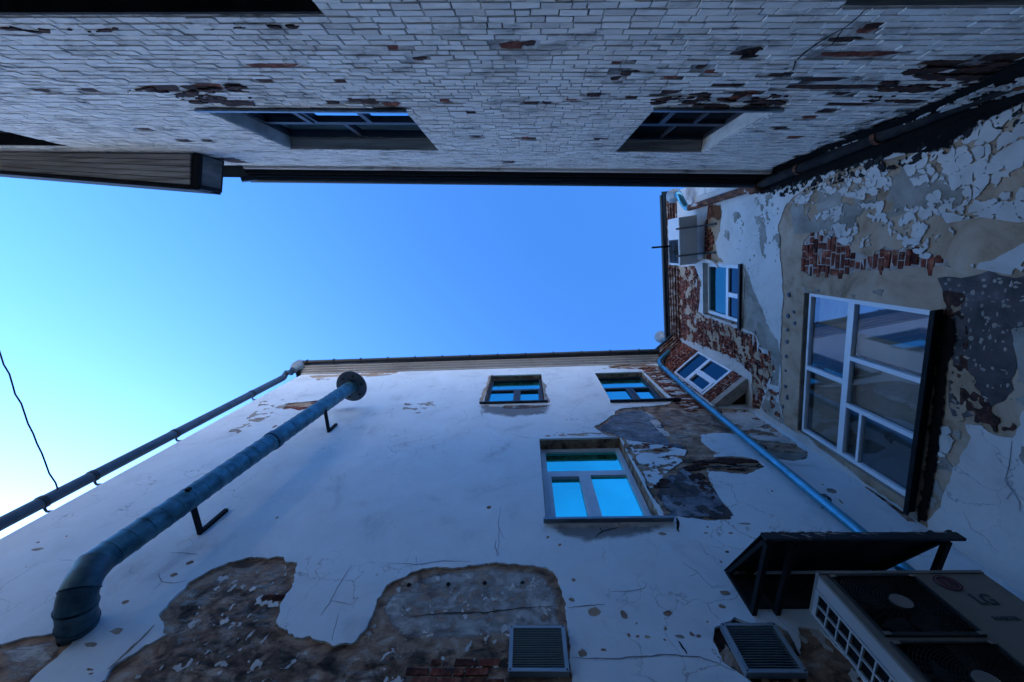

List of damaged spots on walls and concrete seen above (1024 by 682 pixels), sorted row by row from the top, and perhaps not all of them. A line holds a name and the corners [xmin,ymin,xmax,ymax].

spalling [499,40,536,49]
spalling [737,47,764,59]
peeling [127,63,299,109]
spalling [326,98,400,107]
spalling [546,53,1024,534]
crack [321,565,352,638]
spalling [106,558,587,682]
spalling [0,635,71,682]